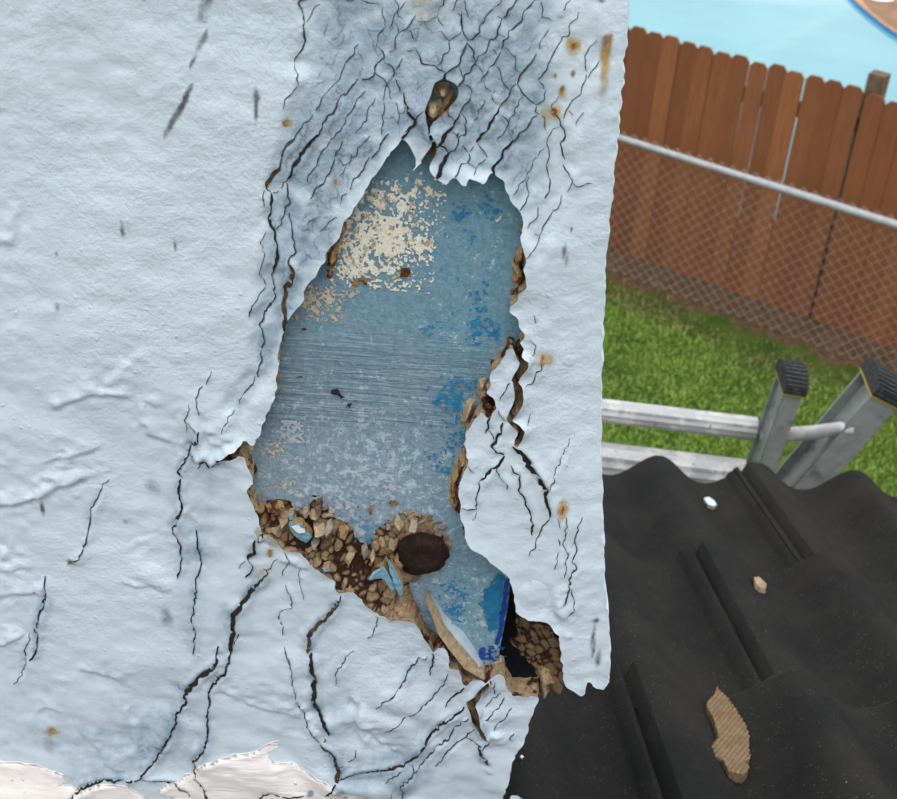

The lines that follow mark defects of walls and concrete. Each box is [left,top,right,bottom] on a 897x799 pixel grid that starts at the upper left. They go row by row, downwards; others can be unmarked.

corrosion [567,38,580,53]
corrosion [601,34,612,76]
peeling [291,172,503,324]
crack [221,0,599,434]
peeling [465,281,517,350]
spalling [510,245,525,296]
spalling [423,375,495,530]
crack [462,316,583,618]
crack [14,576,46,684]
crack [67,371,514,799]
spalling [244,420,510,680]
spalling [537,665,555,698]